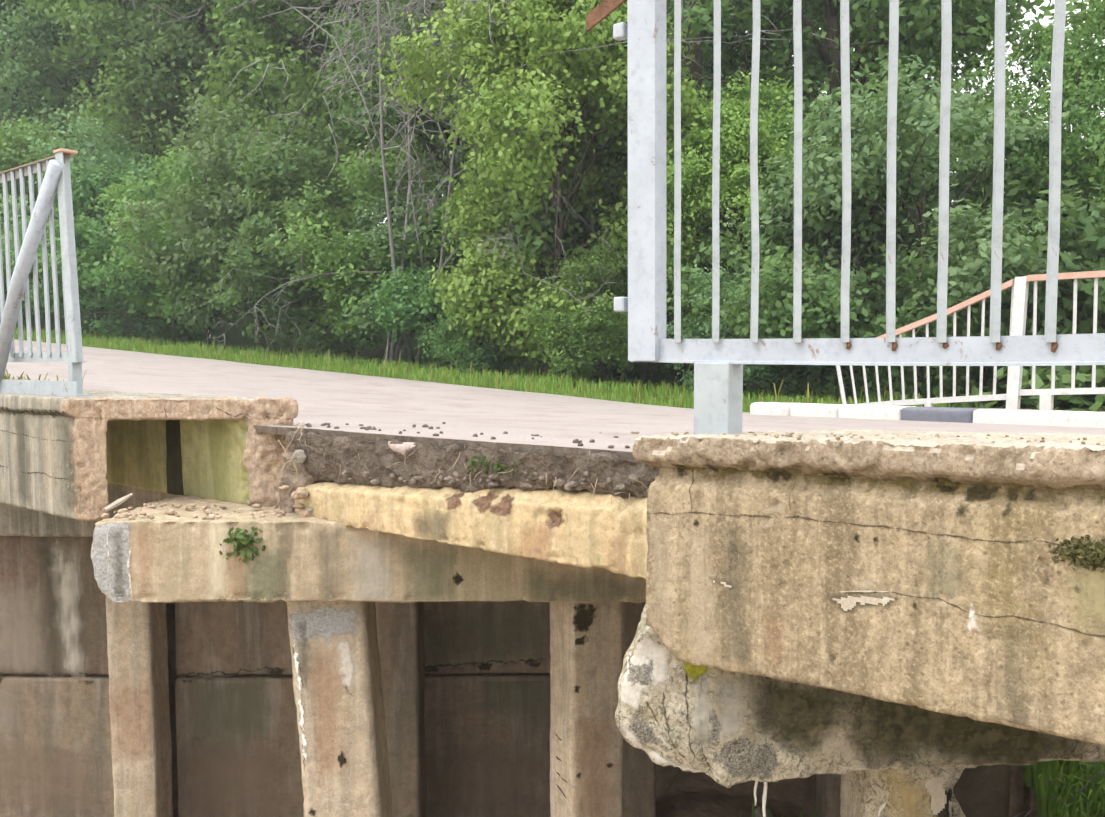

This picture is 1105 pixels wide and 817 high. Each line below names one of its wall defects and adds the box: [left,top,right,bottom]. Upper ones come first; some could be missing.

spalling [447,491,514,515]
peeling [91,522,132,602]
spalling [833,590,894,611]
crack [855,592,1105,637]
peeling [288,606,357,687]